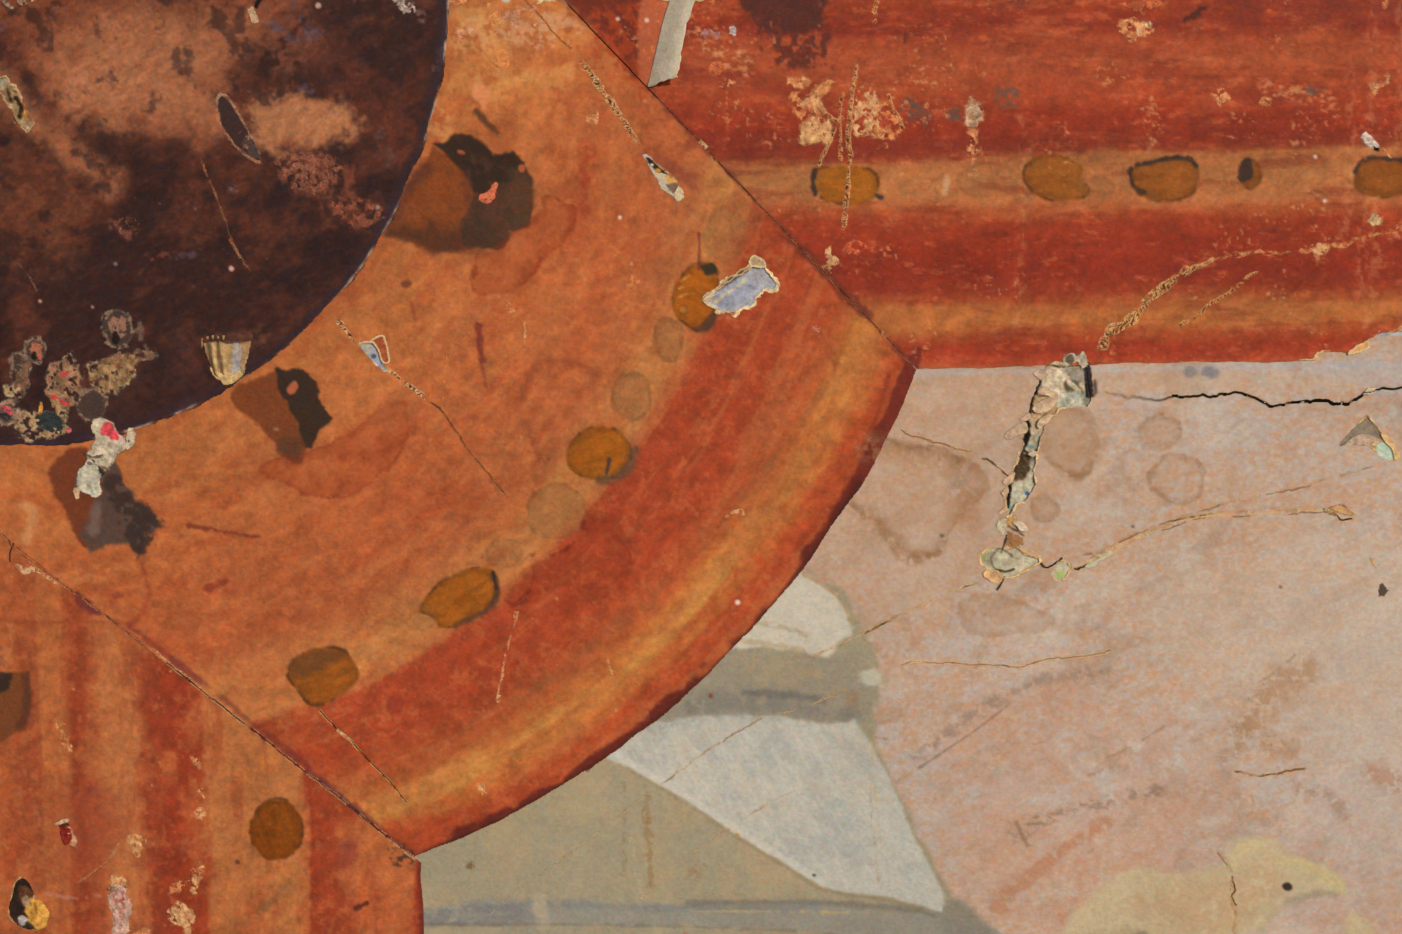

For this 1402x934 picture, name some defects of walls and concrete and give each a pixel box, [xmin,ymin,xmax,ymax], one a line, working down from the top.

peeling [647,0,736,87]
peeling [702,255,780,317]
crack [1159,387,1402,408]
peeling [73,418,135,499]
peeling [978,546,1085,591]